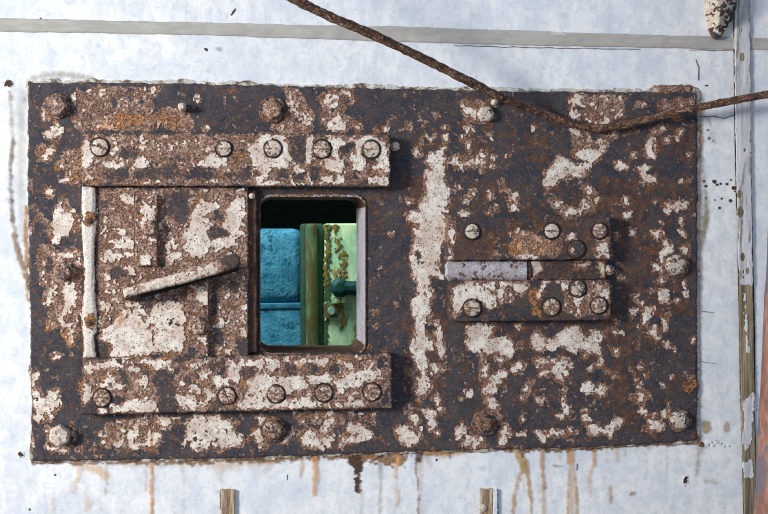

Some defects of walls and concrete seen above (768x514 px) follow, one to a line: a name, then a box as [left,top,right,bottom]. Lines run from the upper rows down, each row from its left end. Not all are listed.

peeling [543,93,625,189]
peeling [615,125,683,185]
peeling [702,0,753,353]
peeling [32,86,390,453]
rust [323,224,348,286]
rust [336,303,349,330]
peeling [395,103,508,449]
peeling [452,272,626,446]
peeling [629,362,669,432]
peeling [629,201,689,353]
rust [53,451,454,514]
rust [503,446,623,514]